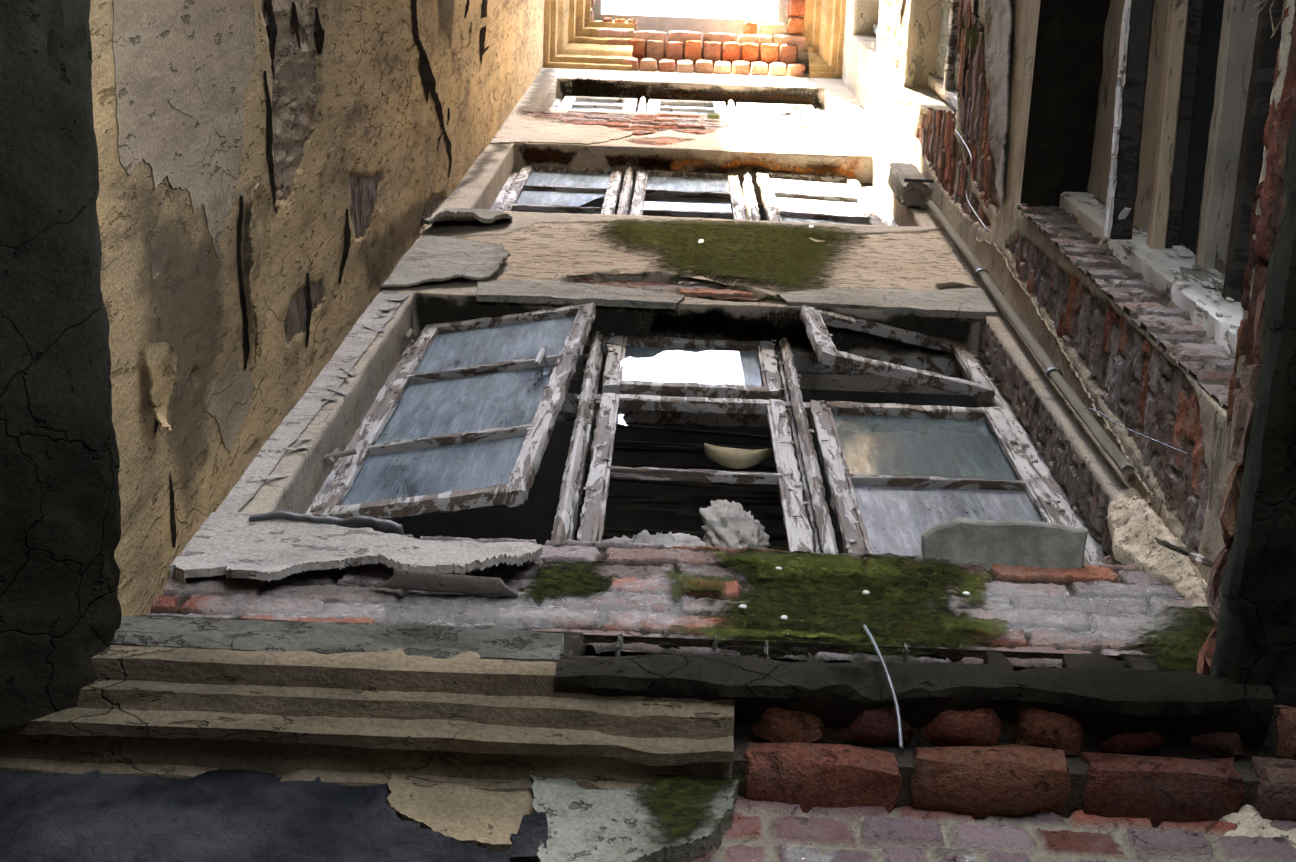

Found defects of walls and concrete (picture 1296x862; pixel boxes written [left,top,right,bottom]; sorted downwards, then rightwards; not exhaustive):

crack [411,0,452,178]
spalling [146,0,1217,671]
spalling [0,705,1296,862]